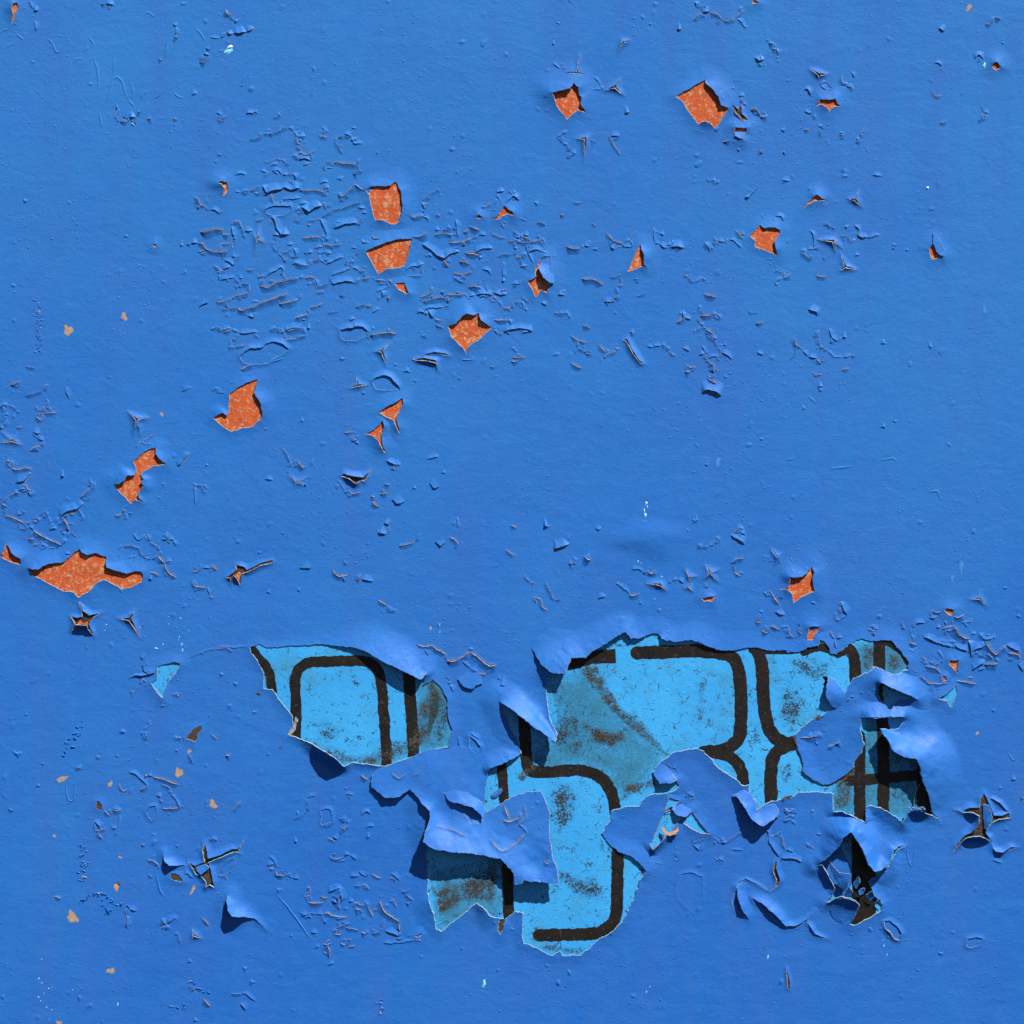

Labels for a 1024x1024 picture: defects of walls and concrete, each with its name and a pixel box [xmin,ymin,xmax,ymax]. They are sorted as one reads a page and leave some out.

peeling [201,165,242,209]
peeling [248,201,295,258]
peeling [350,167,424,308]
peeling [461,192,529,231]
peeling [515,240,569,311]
peeling [408,293,505,375]
peeling [240,545,1023,966]
peeling [152,834,274,938]